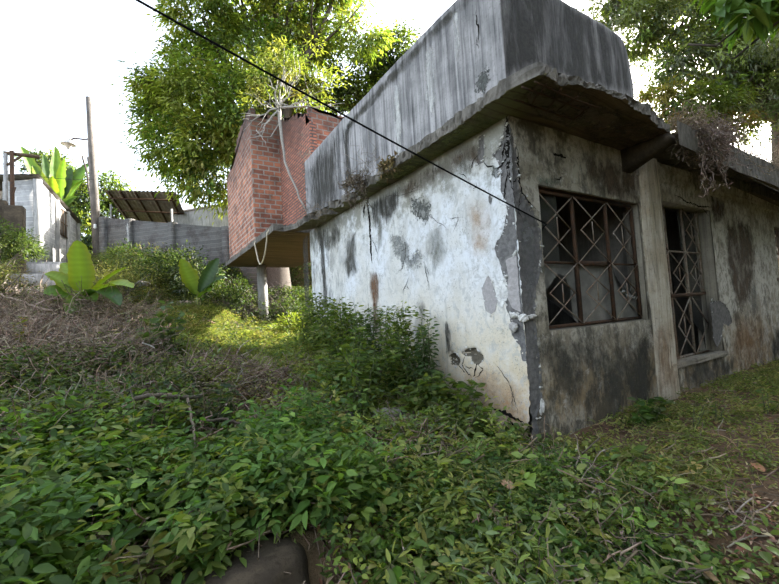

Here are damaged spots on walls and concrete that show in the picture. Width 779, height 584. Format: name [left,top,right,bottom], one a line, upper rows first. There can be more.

damp [310,12,459,212]
damp [372,168,443,236]
damp [303,227,340,319]
damp [345,236,356,276]
rust [370,274,378,330]
spalling [474,119,544,442]
damp [711,196,756,312]
spalling [449,347,484,377]
damp [542,338,650,406]